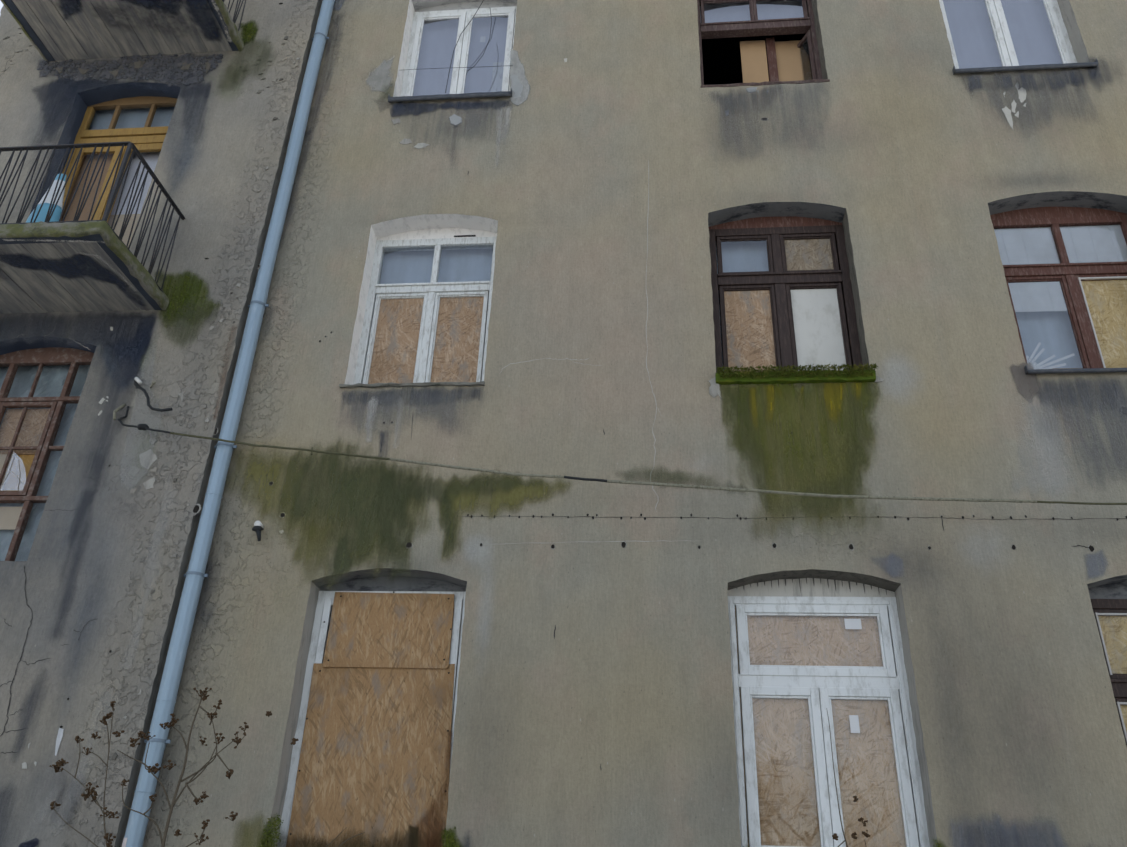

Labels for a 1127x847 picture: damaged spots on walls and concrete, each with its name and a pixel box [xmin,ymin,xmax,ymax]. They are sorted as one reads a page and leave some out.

spalling [449,114,462,126]
peeling [1002,83,1026,131]
water stain [1010,363,1127,469]
crack [0,566,95,754]